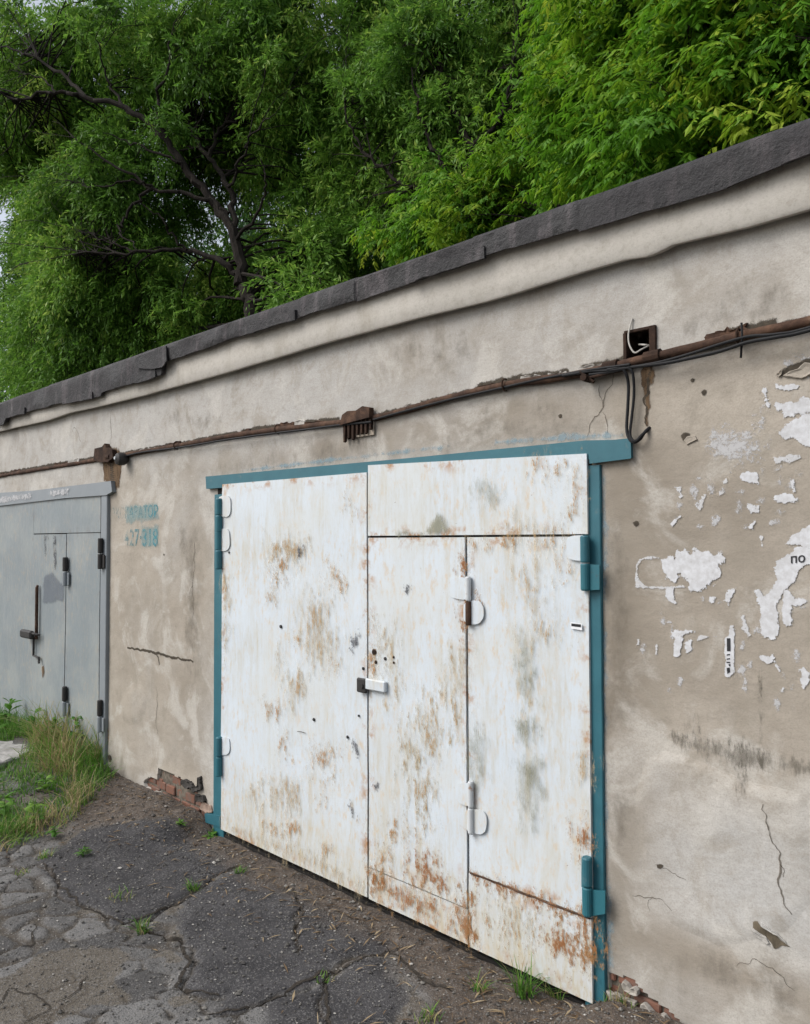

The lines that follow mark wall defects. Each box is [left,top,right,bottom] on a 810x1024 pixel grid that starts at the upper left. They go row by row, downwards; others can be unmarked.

crack [587,376,614,436]
peeling [779,413,810,447]
rust [102,447,122,488]
rust [268,532,305,607]
rust [453,457,588,642]
peeling [781,589,808,626]
crack [127,647,193,665]
flaking render [147,769,213,818]
rust [227,776,616,978]
crack [761,804,792,915]
flaking render [752,921,789,949]
flaking render [606,973,680,1022]